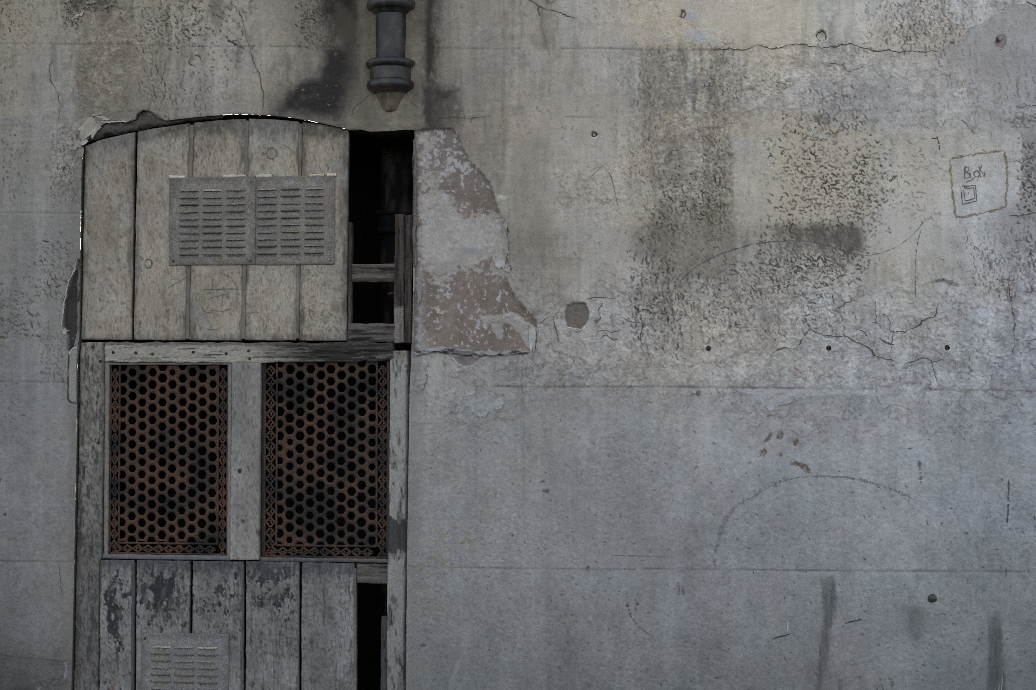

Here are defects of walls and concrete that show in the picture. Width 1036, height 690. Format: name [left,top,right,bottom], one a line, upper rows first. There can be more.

crack [529,0,573,18]
water stain [271,0,361,125]
water stain [420,0,458,131]
peeling [66,112,111,158]
crack [1009,156,1036,216]
flaking render [412,127,538,367]
flaking render [564,301,590,334]
crack [776,294,945,383]
crack [1007,279,1035,352]
water stain [814,572,845,690]
water stain [898,573,934,649]
water stain [984,610,1009,690]